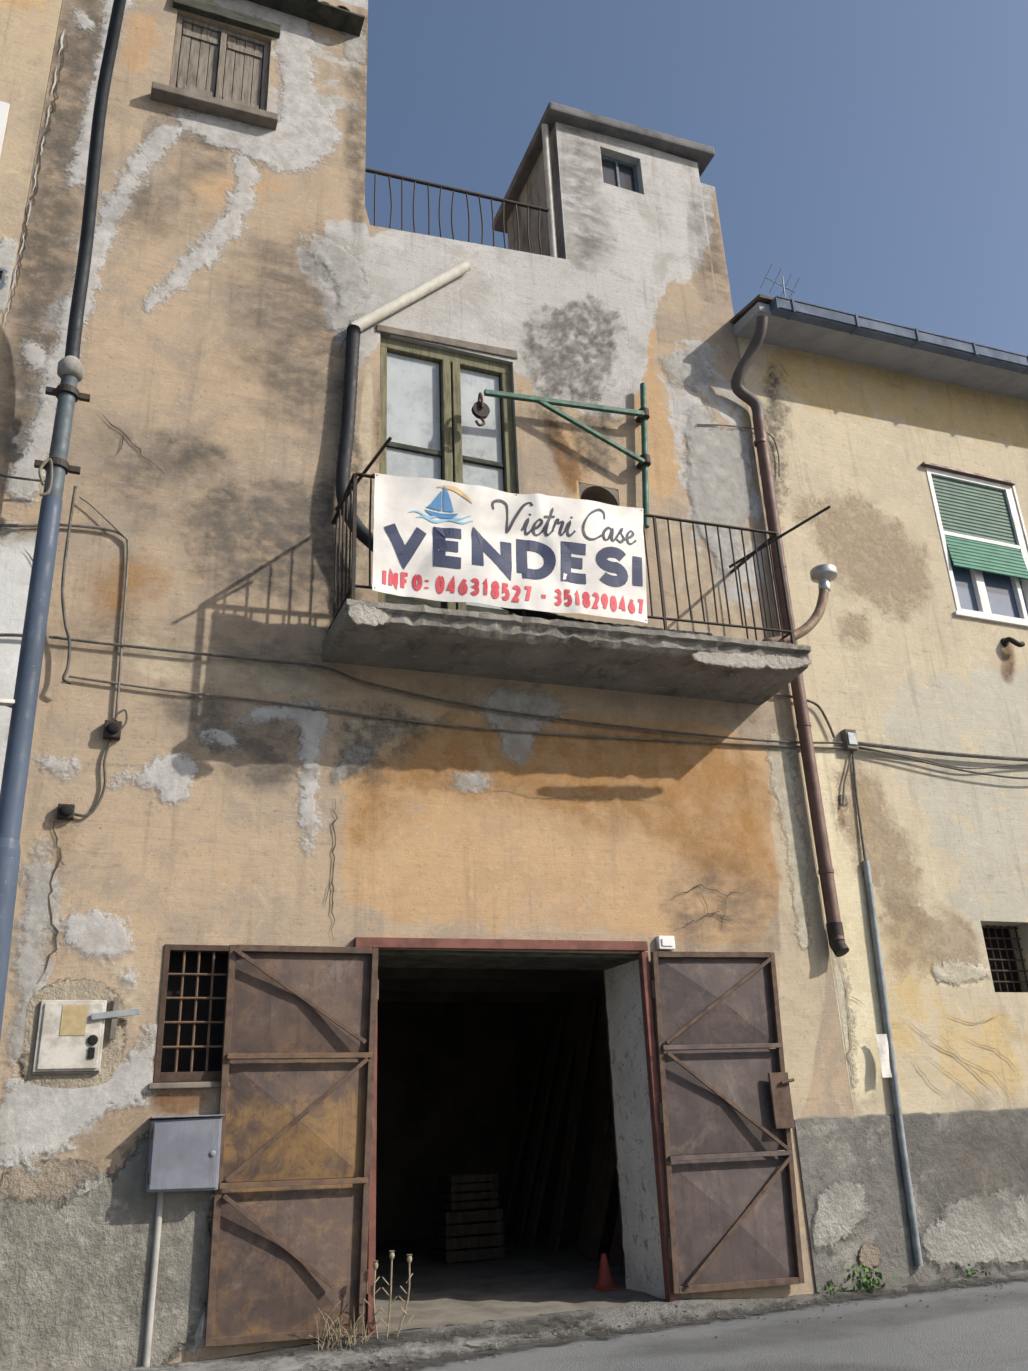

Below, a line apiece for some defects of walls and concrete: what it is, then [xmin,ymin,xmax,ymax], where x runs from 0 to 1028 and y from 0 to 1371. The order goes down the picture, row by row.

crack [4,30,68,325]
peeling [142,155,261,313]
damp [525,296,620,471]
damp [190,483,361,612]
rust [1003,646,1013,678]
crack [324,802,338,940]
crack [673,884,749,930]
flaking render [0,1158,98,1209]
peeling [812,1178,882,1271]